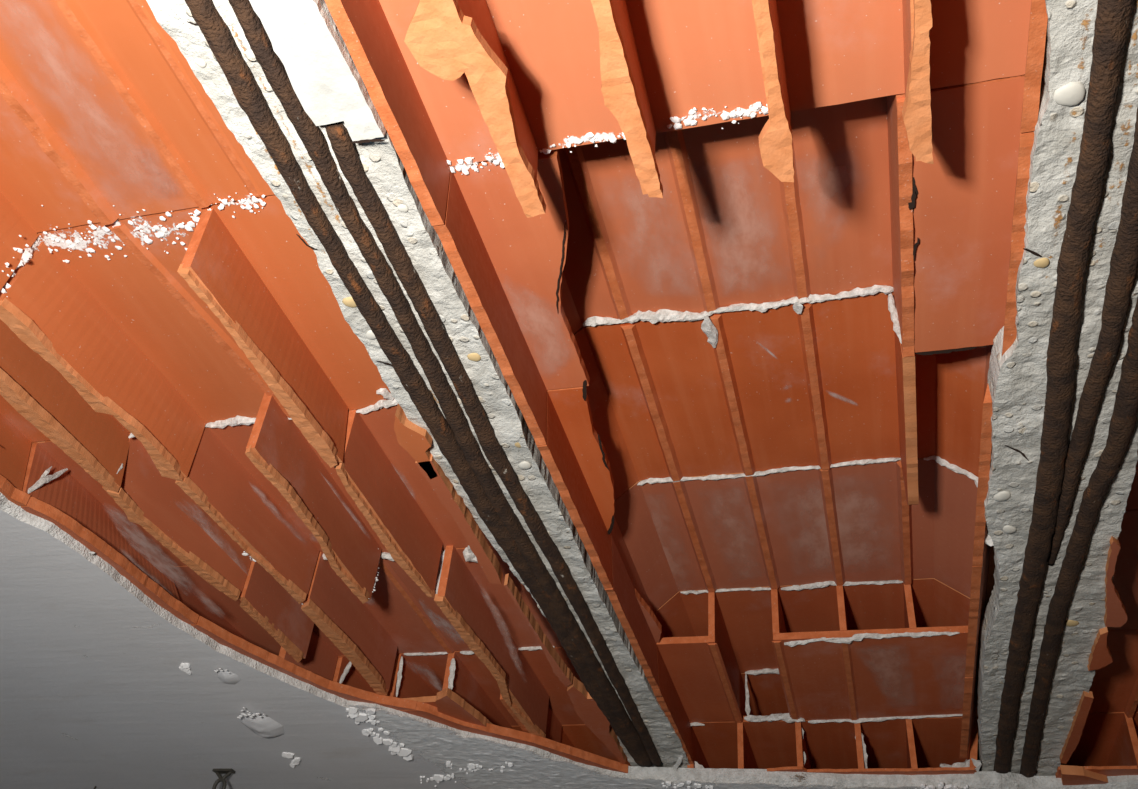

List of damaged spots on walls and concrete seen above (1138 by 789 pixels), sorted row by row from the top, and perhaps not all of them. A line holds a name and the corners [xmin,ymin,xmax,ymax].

damp [0,193,266,297]
spalling [146,0,545,616]
damp [447,152,505,175]
spalling [318,125,690,768]
spalling [0,268,1138,789]
damp [536,132,626,154]
damp [667,102,768,130]
spalling [977,0,1098,771]
spalling [1068,0,1138,444]